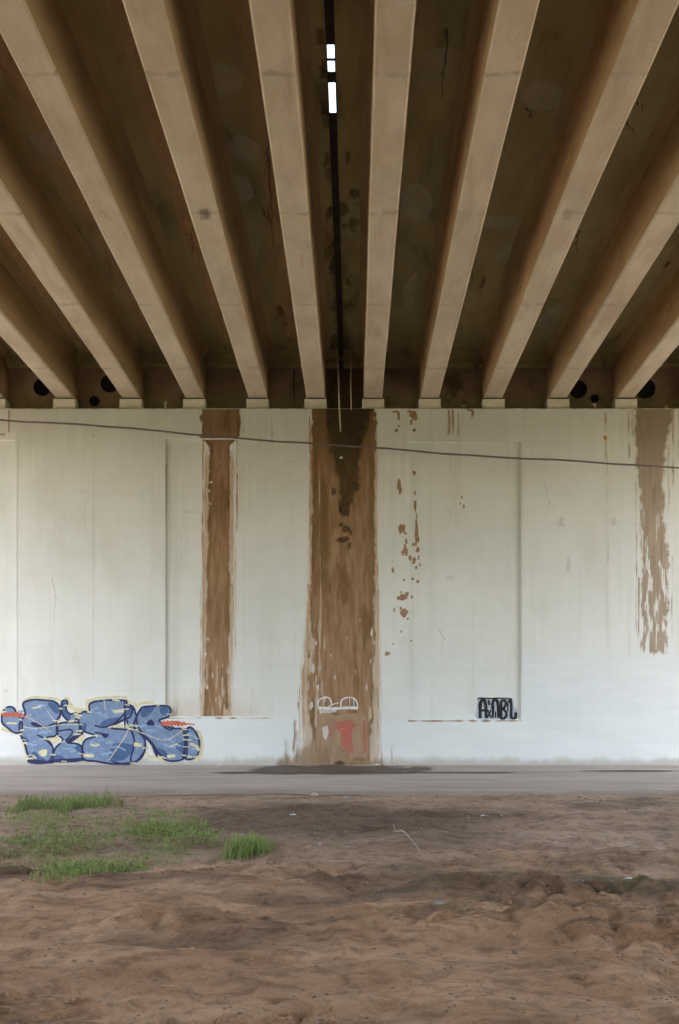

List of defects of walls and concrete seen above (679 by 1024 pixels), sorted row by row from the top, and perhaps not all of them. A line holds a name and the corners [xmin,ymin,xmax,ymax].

crack [261,136,280,292]
corrosion [200,409,241,719]
corrosion [293,409,379,764]
corrosion [628,409,674,653]